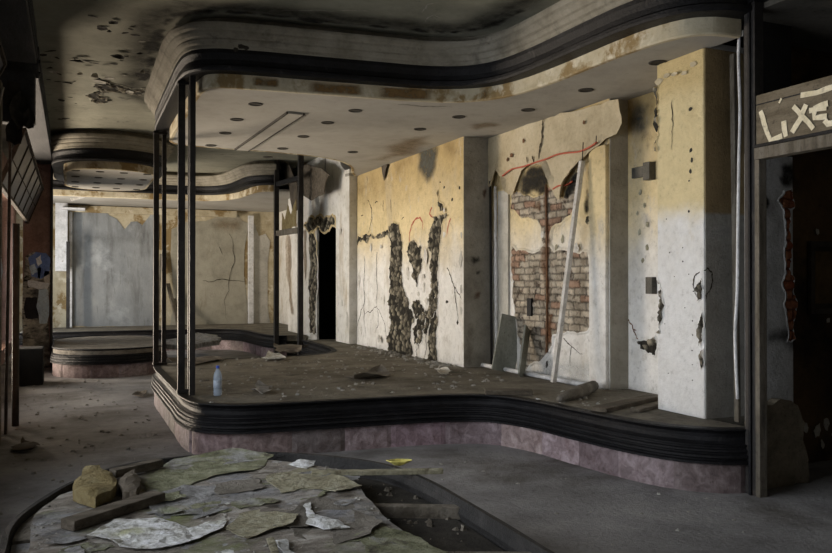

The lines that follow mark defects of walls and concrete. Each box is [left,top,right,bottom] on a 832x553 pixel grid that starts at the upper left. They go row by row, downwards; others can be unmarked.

flaking render [652,61,697,153]
flaking render [303,213,336,336]
flaking render [357,182,453,362]
flaking render [510,170,589,371]
flaking render [637,277,666,361]
flaking render [778,188,798,343]